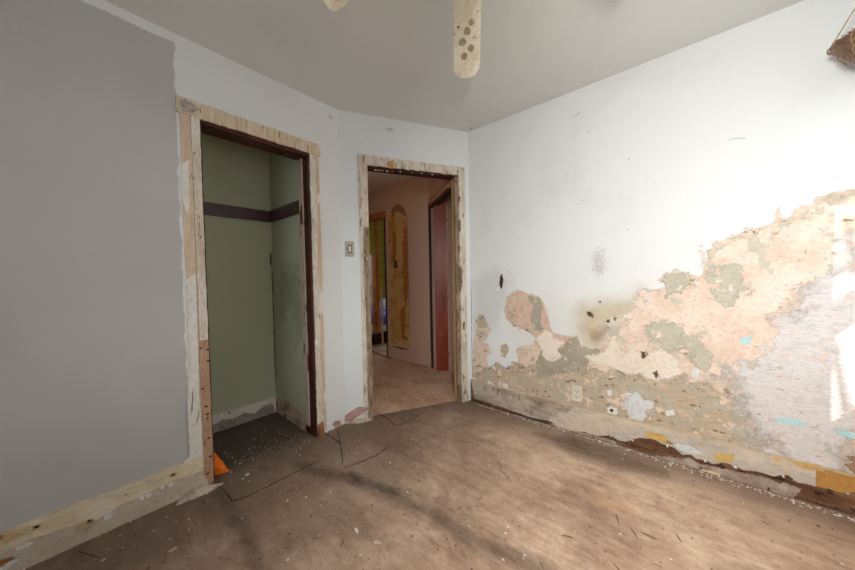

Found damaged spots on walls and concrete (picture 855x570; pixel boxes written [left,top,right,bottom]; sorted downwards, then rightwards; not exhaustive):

flaking render [333,407,369,428]
peeling [463,189,855,498]